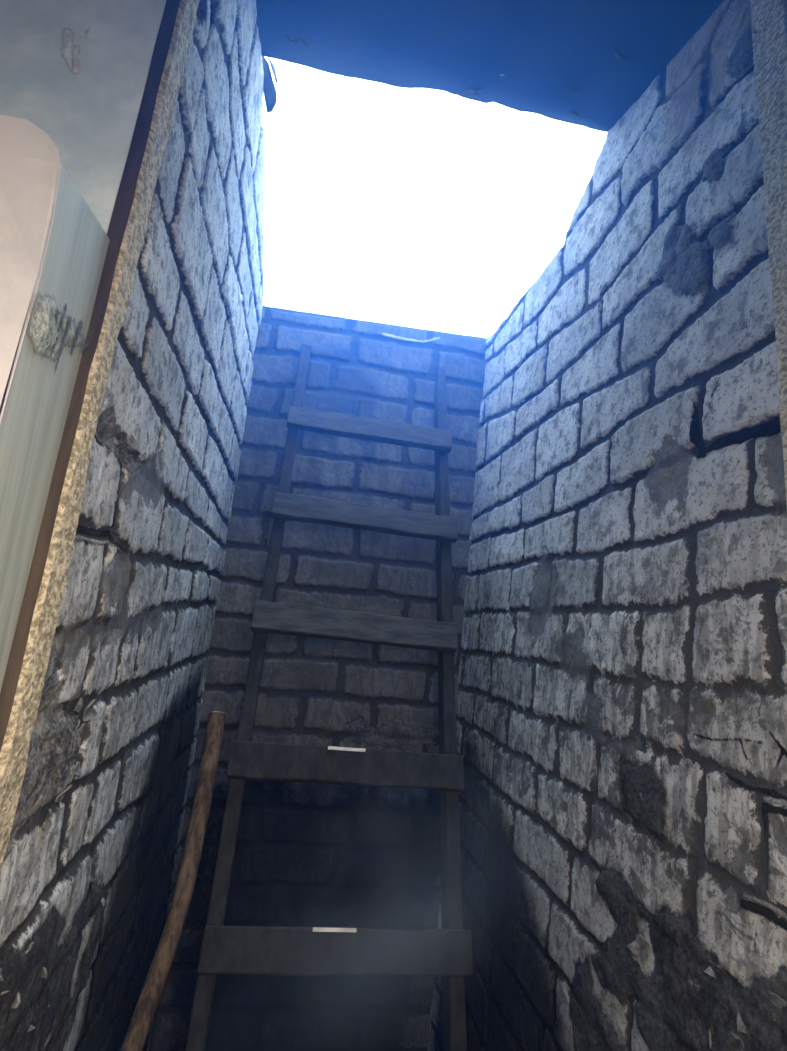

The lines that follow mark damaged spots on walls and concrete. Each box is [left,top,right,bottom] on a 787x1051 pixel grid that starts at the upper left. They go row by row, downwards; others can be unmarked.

spalling [95,405,140,475]